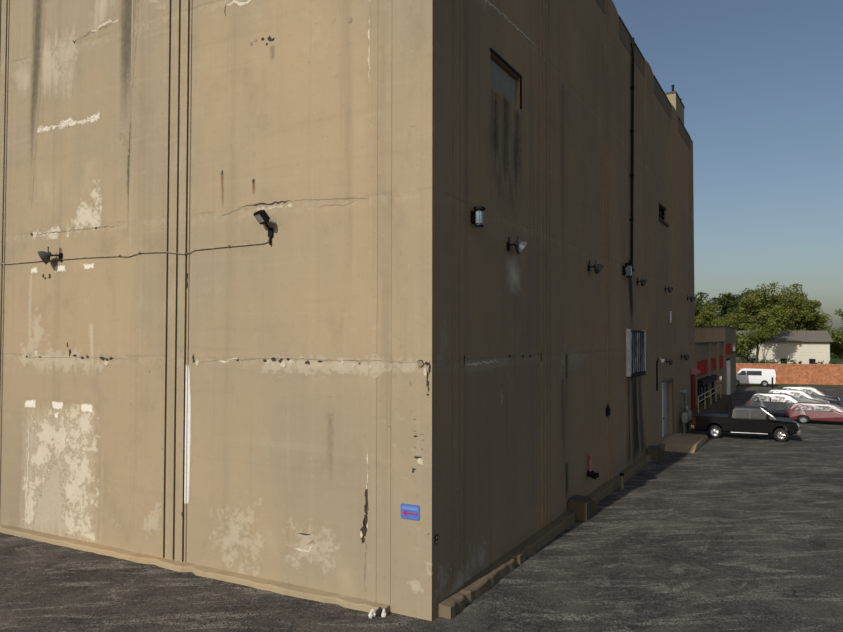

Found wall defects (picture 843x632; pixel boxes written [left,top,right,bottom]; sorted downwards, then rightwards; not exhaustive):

water stain [28,0,46,209]
peeling [33,178,103,241]
water stain [118,0,139,234]
crack [222,197,367,215]
water stain [487,85,525,221]
peeling [17,397,121,545]
peeling [140,498,162,539]
peeling [207,489,266,577]
peeling [282,515,340,579]
crack [360,451,368,591]